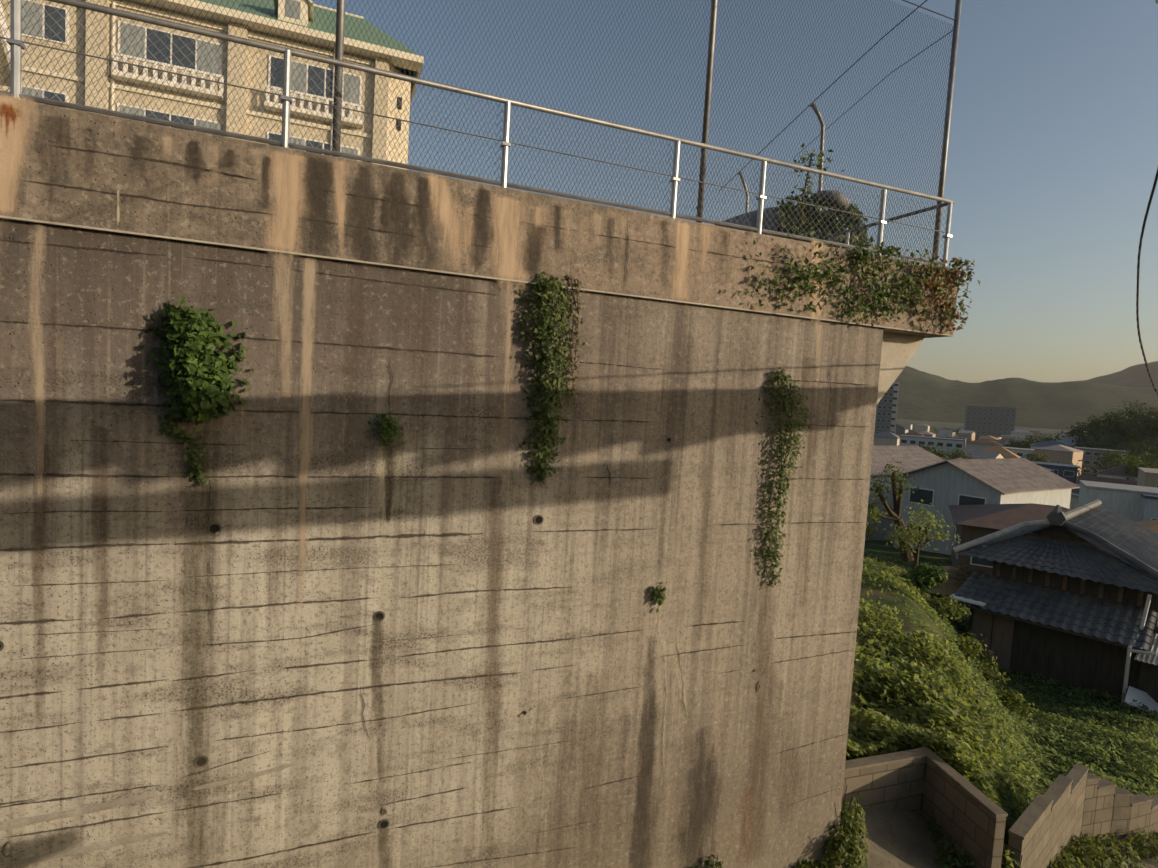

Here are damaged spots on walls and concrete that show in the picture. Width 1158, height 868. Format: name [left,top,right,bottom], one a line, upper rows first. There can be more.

rust [0,105,19,133]
leakage [0,94,32,214]
leakage [334,160,345,244]
leakage [30,223,48,597]
leakage [253,150,315,577]